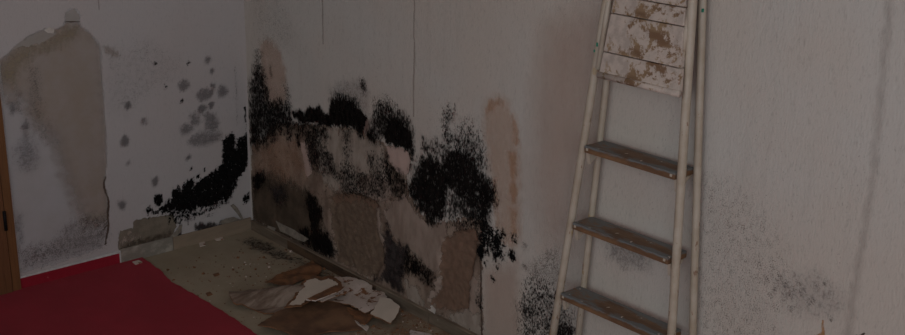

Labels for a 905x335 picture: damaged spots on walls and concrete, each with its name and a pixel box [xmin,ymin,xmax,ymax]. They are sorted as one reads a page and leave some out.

leakage [145,48,576,335]
peeling [251,123,484,335]